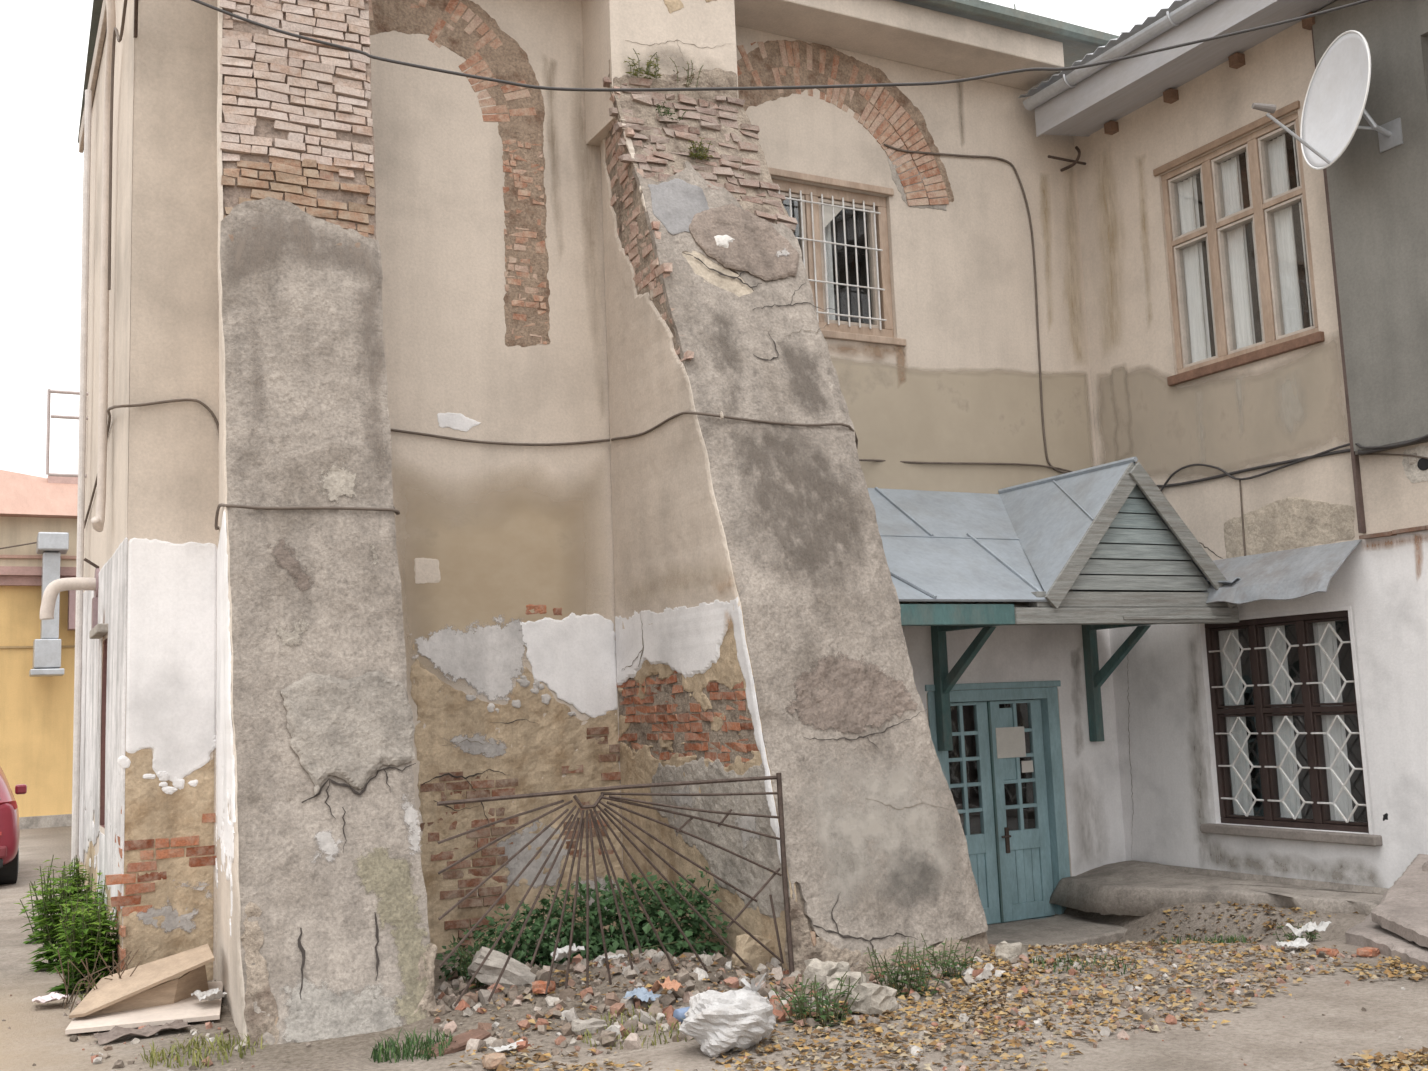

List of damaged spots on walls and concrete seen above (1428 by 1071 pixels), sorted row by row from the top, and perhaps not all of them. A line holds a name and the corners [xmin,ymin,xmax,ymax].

flaking render [221,156,375,248]
flaking render [605,68,753,361]
flaking render [888,152,949,211]
flaking render [525,604,562,615]
peeling [79,735,217,981]
crack [302,719,538,852]
flaking render [240,606,990,1045]
crack [297,928,305,998]
crack [373,912,381,981]
crack [813,892,918,956]